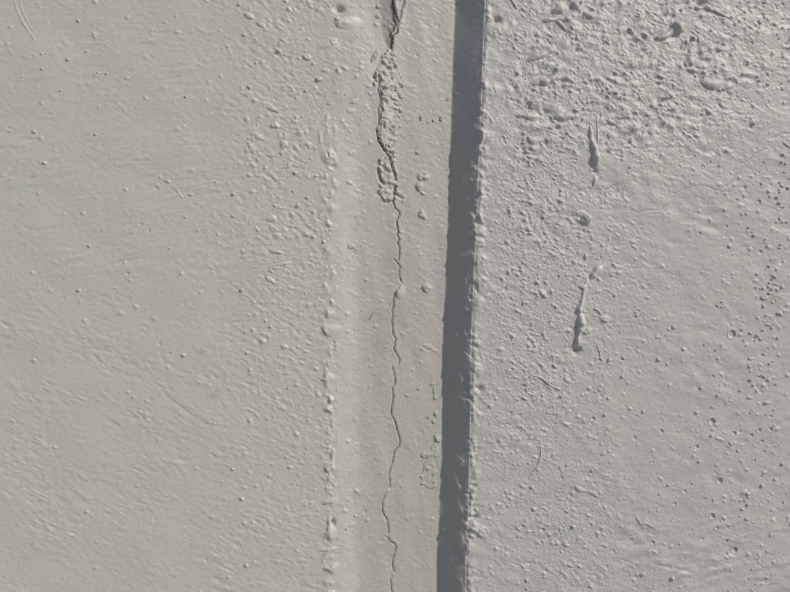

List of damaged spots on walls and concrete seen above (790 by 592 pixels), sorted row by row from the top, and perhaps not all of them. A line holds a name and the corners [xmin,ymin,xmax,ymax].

crack [376,78,401,591]